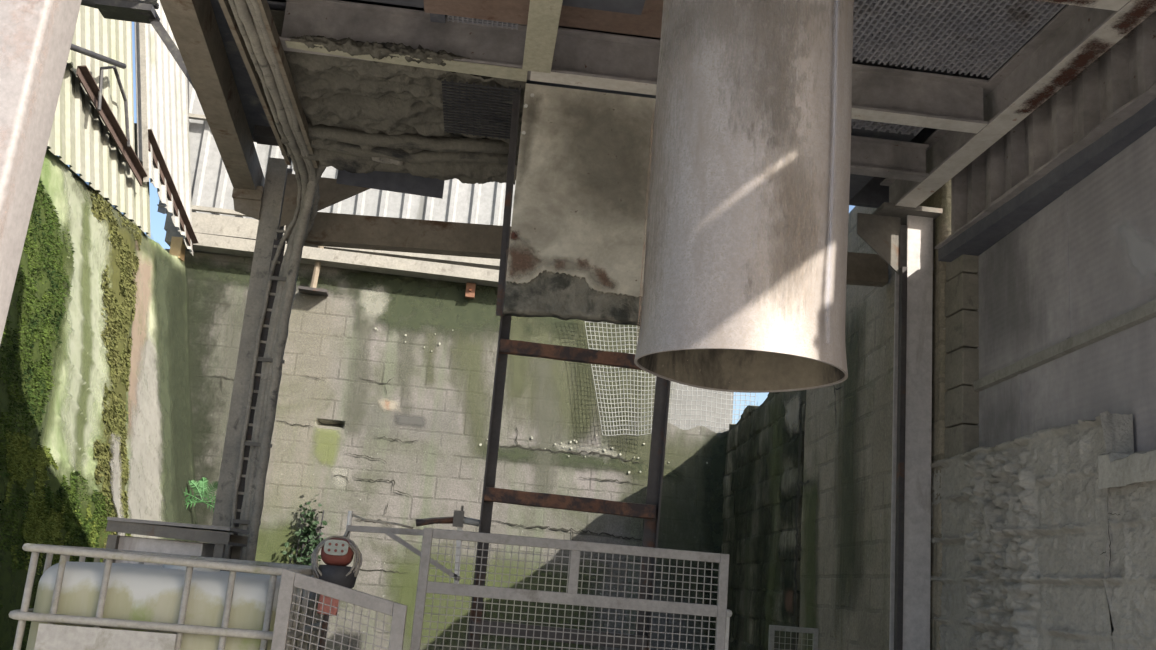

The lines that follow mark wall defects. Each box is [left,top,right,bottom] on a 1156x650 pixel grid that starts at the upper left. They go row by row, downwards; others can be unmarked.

corrosion [1112,0,1156,38]
corrosion [1016,41,1110,114]
water stain [827,0,838,324]
water stain [187,260,251,286]
water stain [296,274,337,291]
corrosion [510,231,536,275]
corrosion [556,260,613,287]
water stain [42,165,158,499]
water stain [111,333,163,521]
water stain [727,429,797,650]